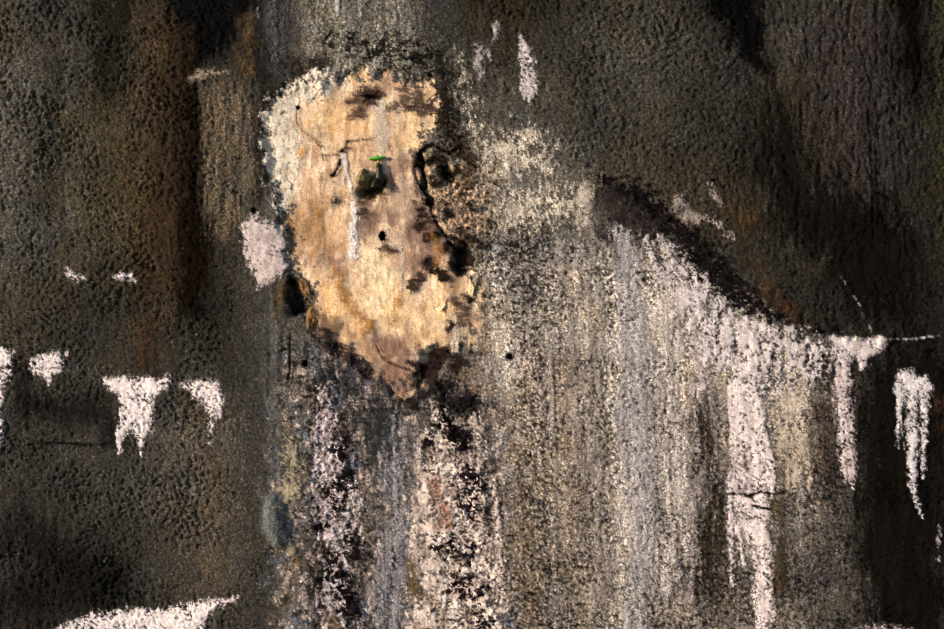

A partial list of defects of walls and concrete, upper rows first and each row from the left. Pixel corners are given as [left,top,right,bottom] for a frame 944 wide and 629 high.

leakage [0,347,169,457]
crack [296,110,375,204]
leakage [164,0,511,629]
spalling [258,65,483,400]
leakage [315,0,944,629]